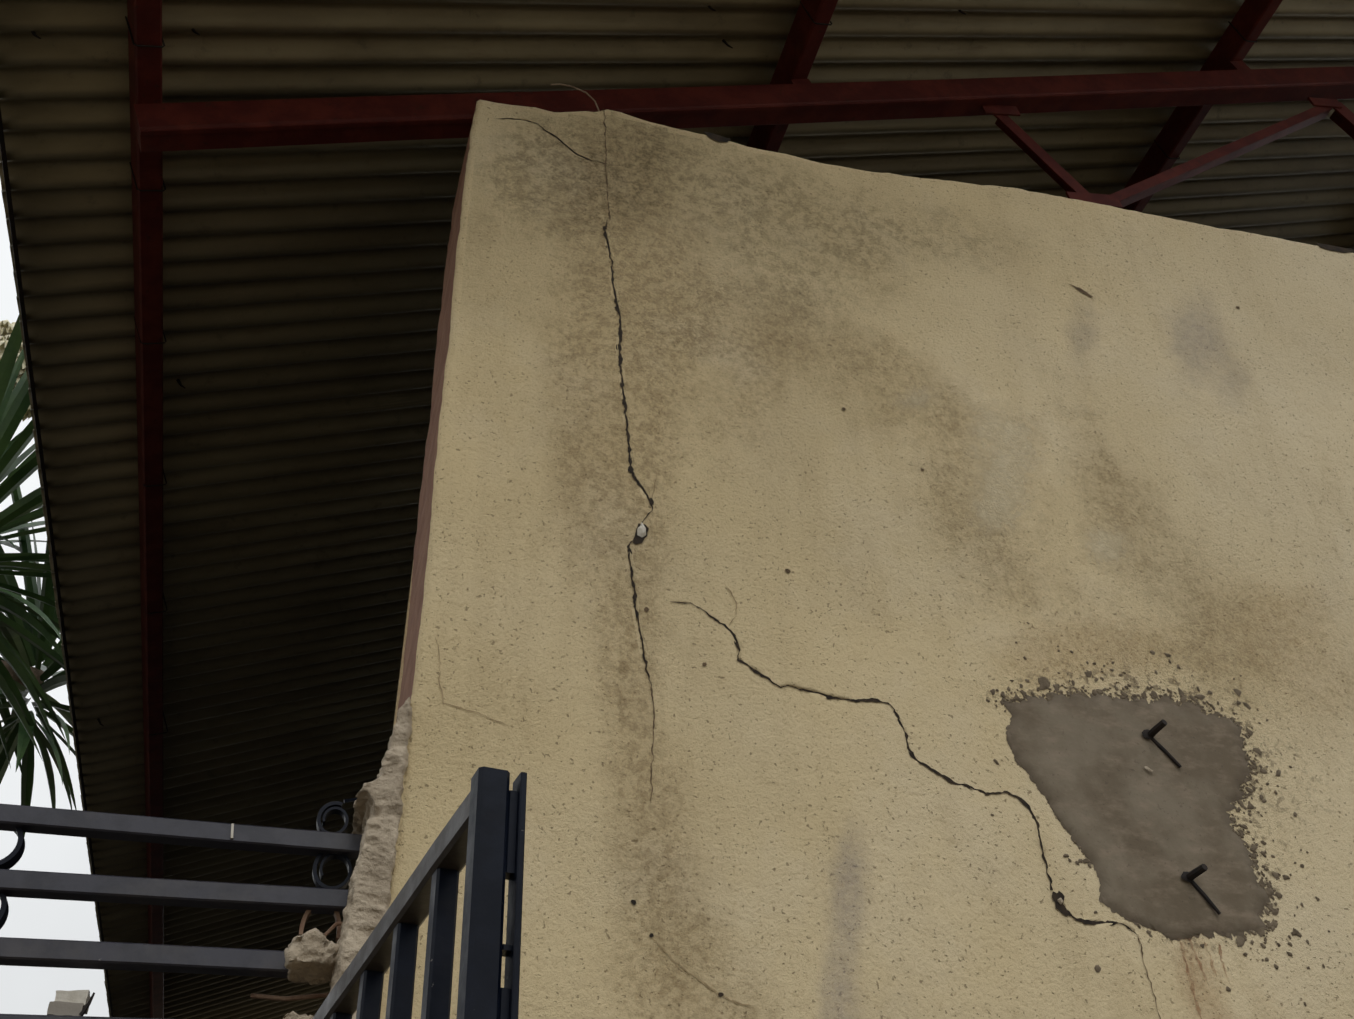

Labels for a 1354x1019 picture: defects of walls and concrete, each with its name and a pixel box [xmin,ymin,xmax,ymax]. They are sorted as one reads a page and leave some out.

crack [495,109,1161,1019]
flaking render [329,697,412,993]
spalling [1052,891,1069,916]